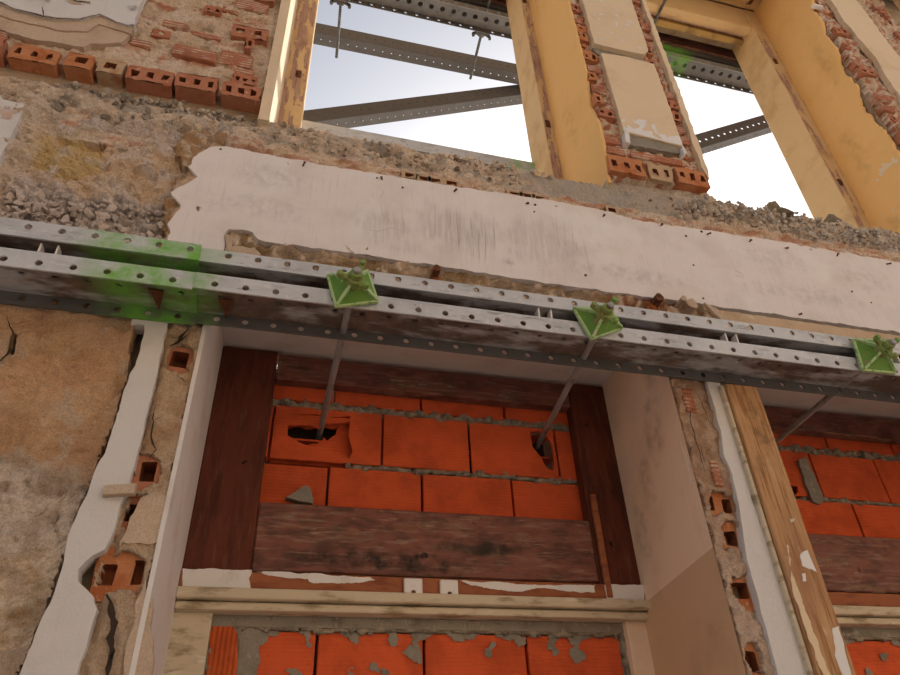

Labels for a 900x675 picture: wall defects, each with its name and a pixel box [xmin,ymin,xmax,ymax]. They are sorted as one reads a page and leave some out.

flaking render [159,130,227,247]
crack [0,318,15,361]
spalling [161,346,194,374]
spalling [267,409,353,466]
spalling [89,454,161,603]
spalling [709,492,739,551]
spalling [730,575,756,618]
peeling [786,544,855,675]
peeling [369,662,389,675]
peeling [387,632,436,664]
peeling [484,634,526,658]
spalling [744,643,761,675]